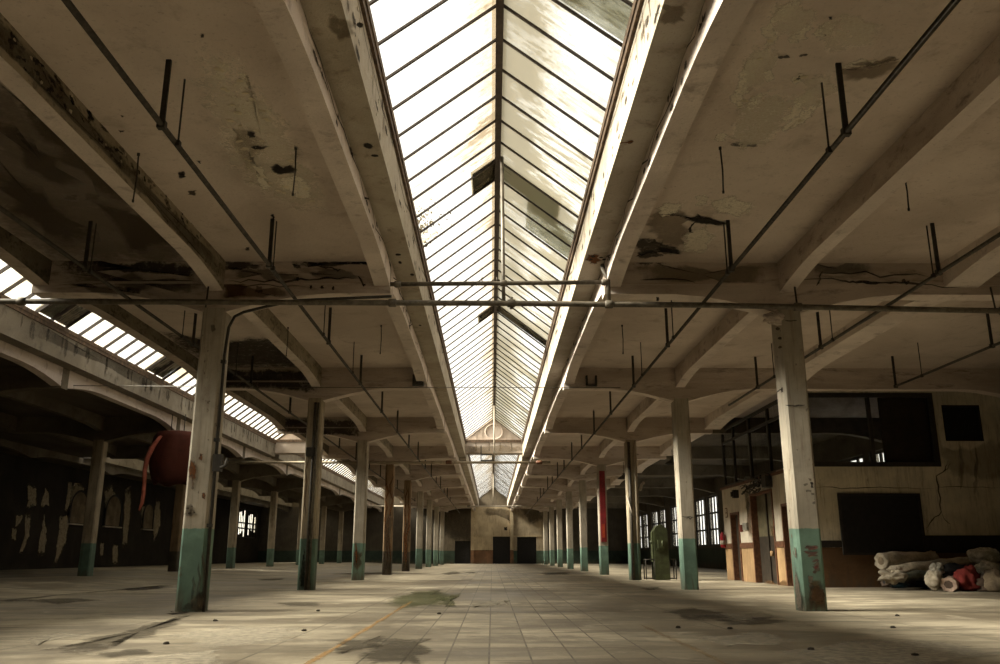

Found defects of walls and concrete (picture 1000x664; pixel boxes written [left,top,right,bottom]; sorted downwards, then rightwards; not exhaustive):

peeling [8,32,192,224]
peeling [604,61,687,263]
spalling [664,214,726,233]
crack [231,266,366,290]
crack [804,271,955,288]
peeling [11,482,84,562]
peeling [100,487,160,563]
crack [833,464,989,526]